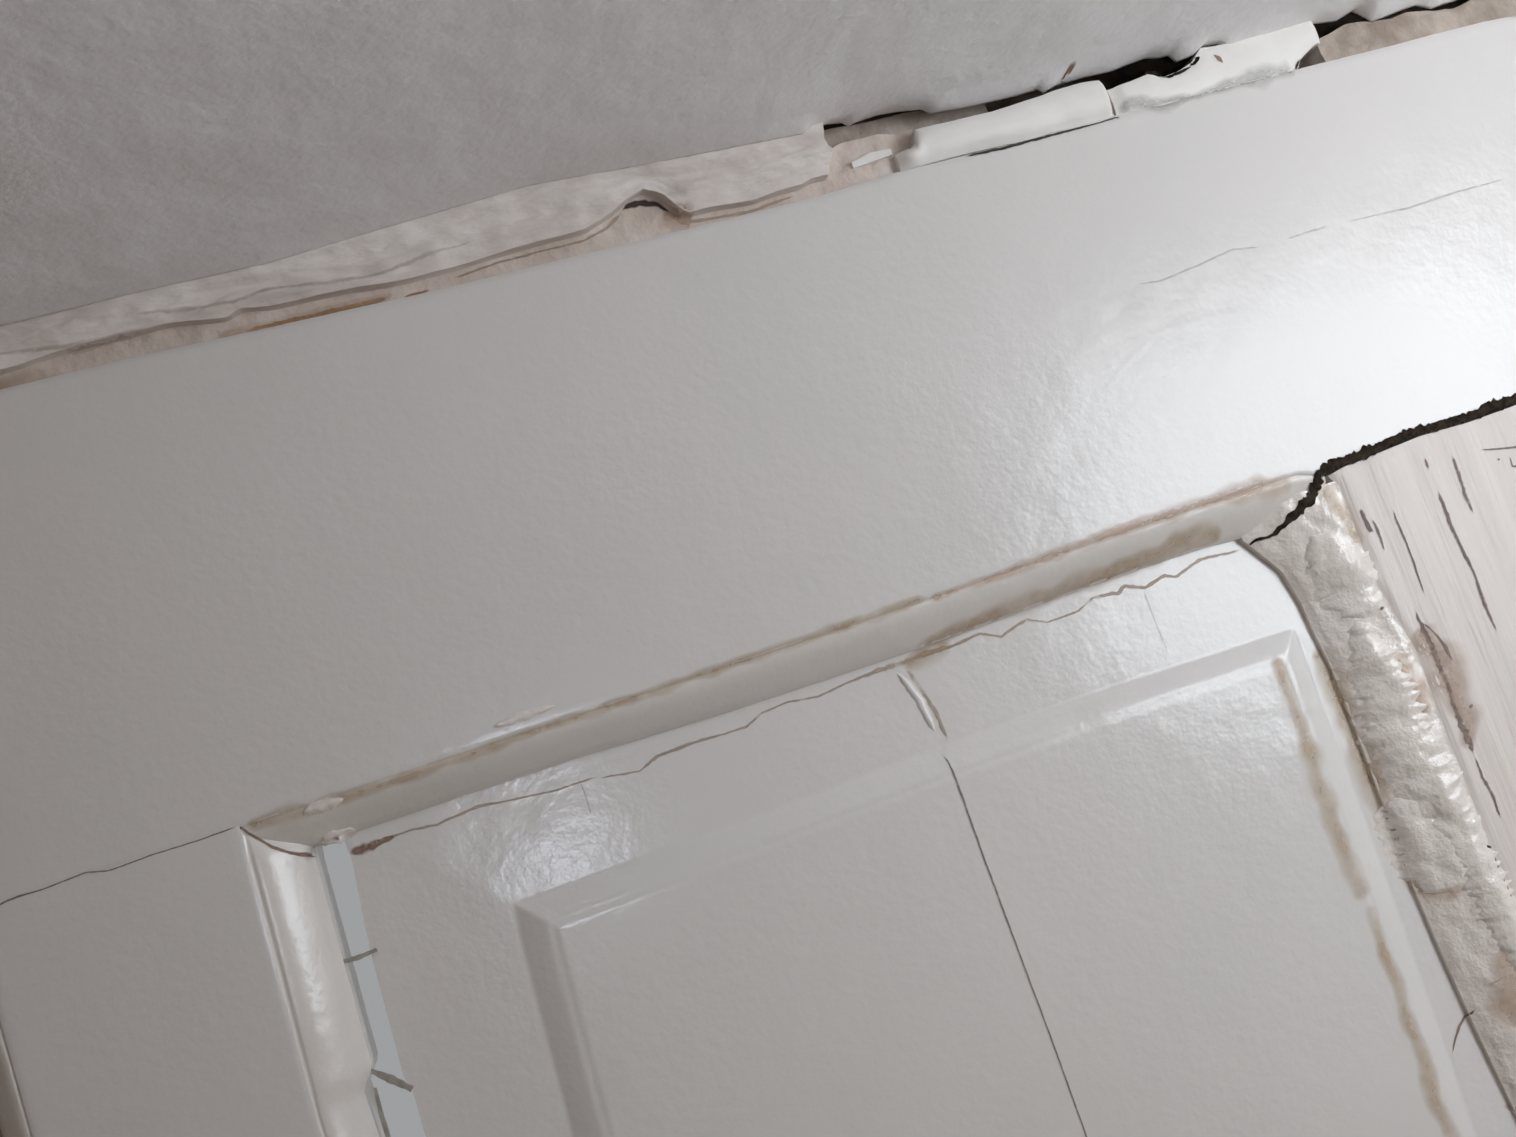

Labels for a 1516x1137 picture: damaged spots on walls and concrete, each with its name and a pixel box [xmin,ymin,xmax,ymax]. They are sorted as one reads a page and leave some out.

spalling [1298,0,1516,69]
spalling [824,104,988,188]
crack [1250,393,1516,629]
crack [0,828,312,905]
crack [897,673,1087,1137]